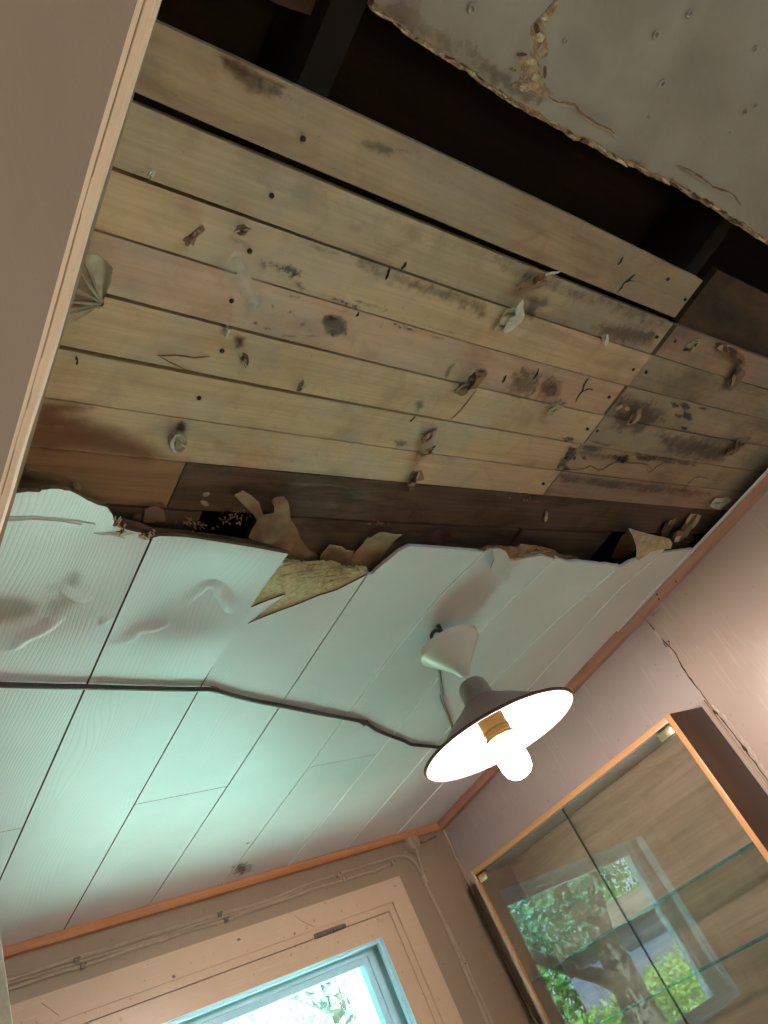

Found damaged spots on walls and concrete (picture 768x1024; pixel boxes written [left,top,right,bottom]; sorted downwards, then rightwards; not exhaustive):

spalling [367,0,768,245]
crack [548,96,617,138]
crack [680,165,742,207]
leakage [323,315,346,336]
peeling [611,528,673,561]
peeling [491,548,511,584]
crack [645,619,768,781]